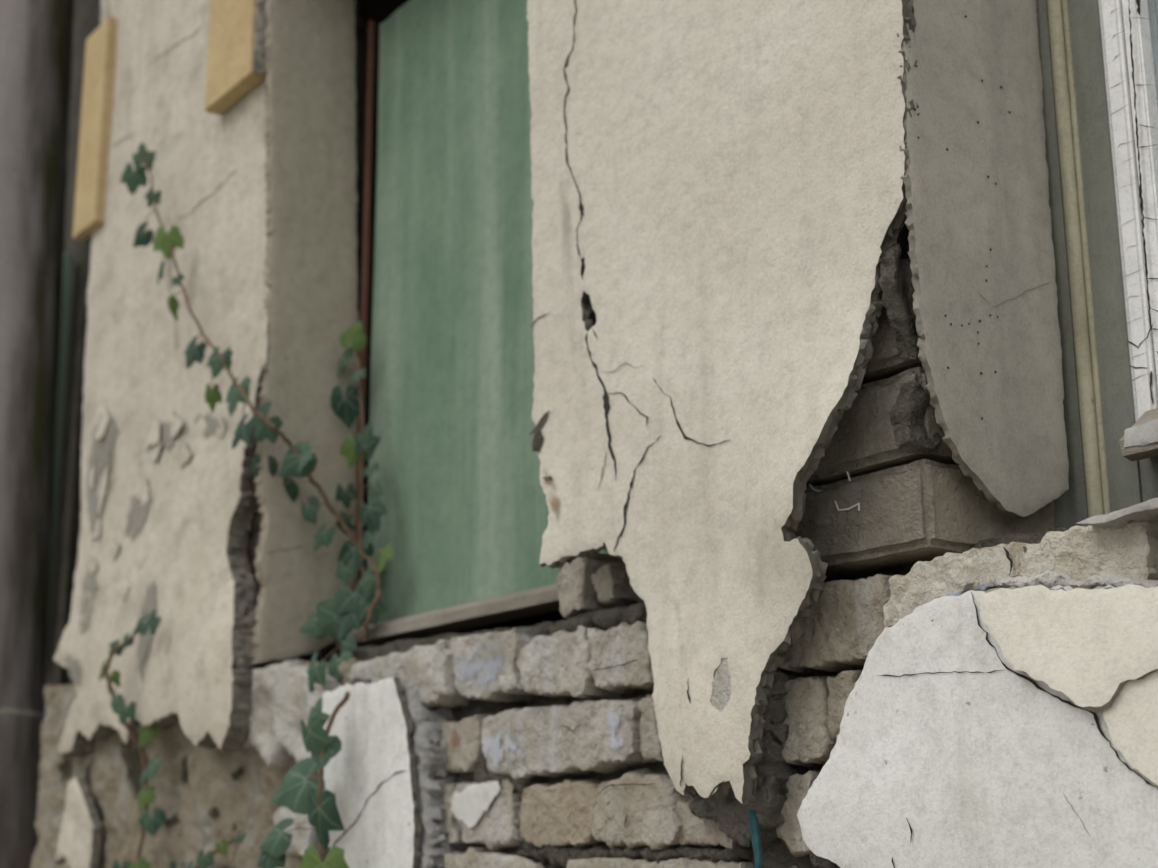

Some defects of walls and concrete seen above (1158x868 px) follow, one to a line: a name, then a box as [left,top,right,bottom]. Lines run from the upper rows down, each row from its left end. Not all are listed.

crack [563,0,584,257]
peeling [30,0,755,868]
crack [585,328,729,550]
peeling [526,0,1158,868]
crack [878,669,1003,677]